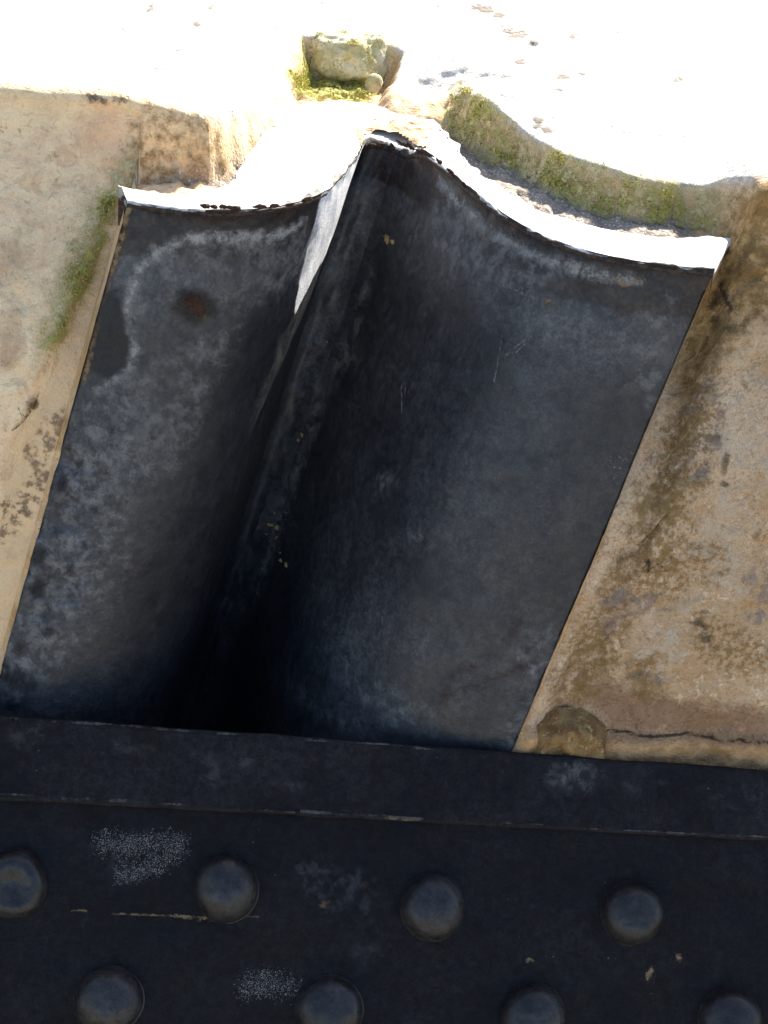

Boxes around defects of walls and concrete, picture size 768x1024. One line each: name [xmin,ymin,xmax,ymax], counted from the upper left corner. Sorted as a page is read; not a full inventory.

damp [94,143,365,392]
corrosion [174,290,215,325]
crack [607,720,768,743]